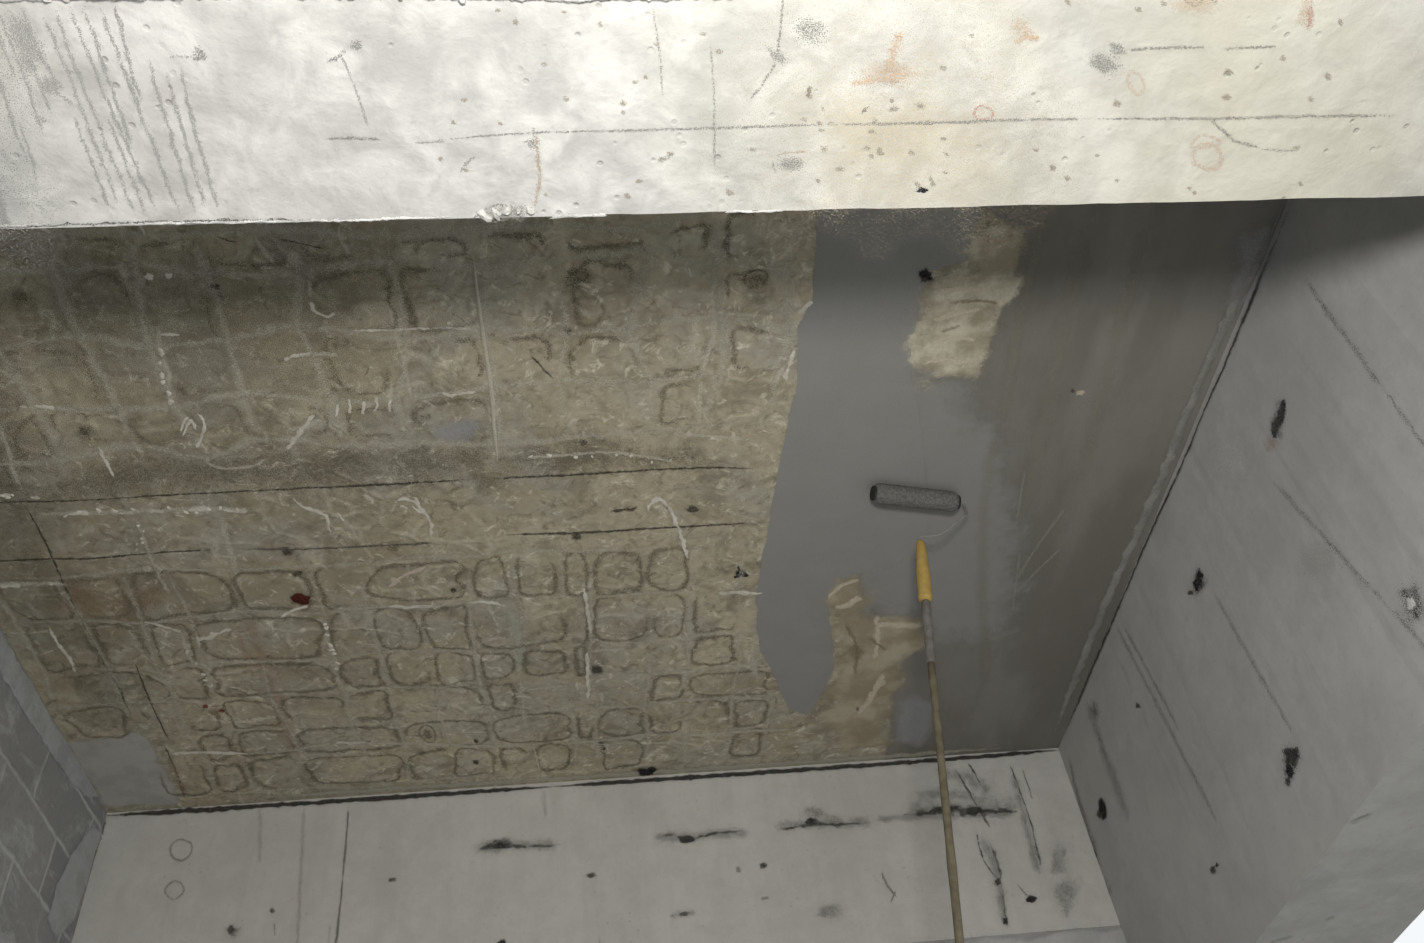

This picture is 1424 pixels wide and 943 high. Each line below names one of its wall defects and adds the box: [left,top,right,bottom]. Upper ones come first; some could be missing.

peeling [101,216,450,227]
spalling [474,193,607,223]
spalling [725,189,782,213]
peeling [900,221,1029,385]